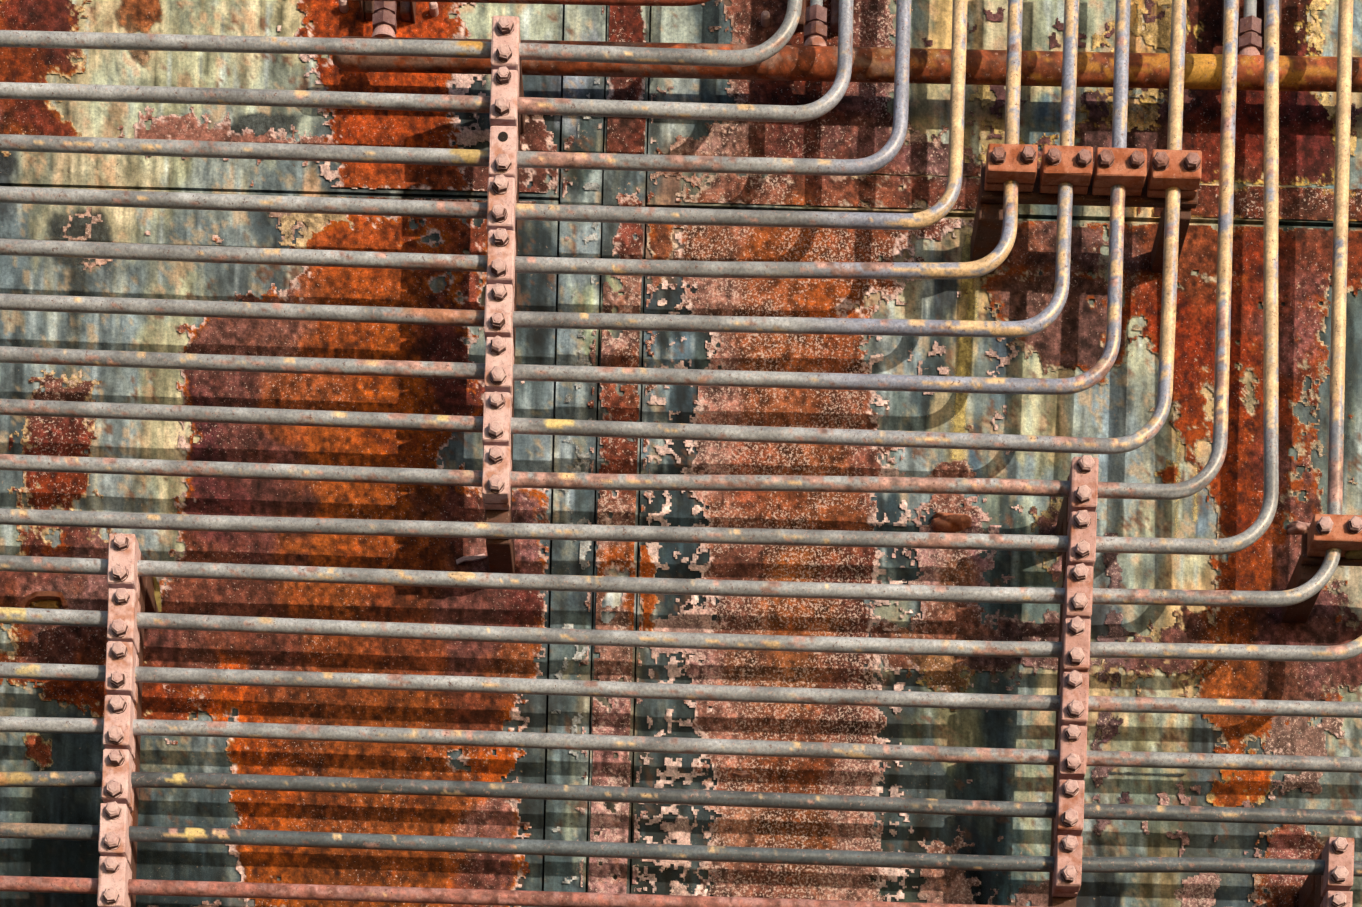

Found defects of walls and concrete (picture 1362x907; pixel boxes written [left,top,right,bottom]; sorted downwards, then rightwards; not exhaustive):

rust [0,0,92,32]
rust [299,54,462,95]
rust [598,77,1005,238]
rust [980,88,1362,591]
peeling [646,491,704,527]
peeling [646,542,708,578]
rust [0,623,108,718]
rust [1088,566,1362,808]
peeling [647,700,714,737]
peeling [640,752,715,788]
peeling [634,803,713,844]
peeling [875,867,918,902]